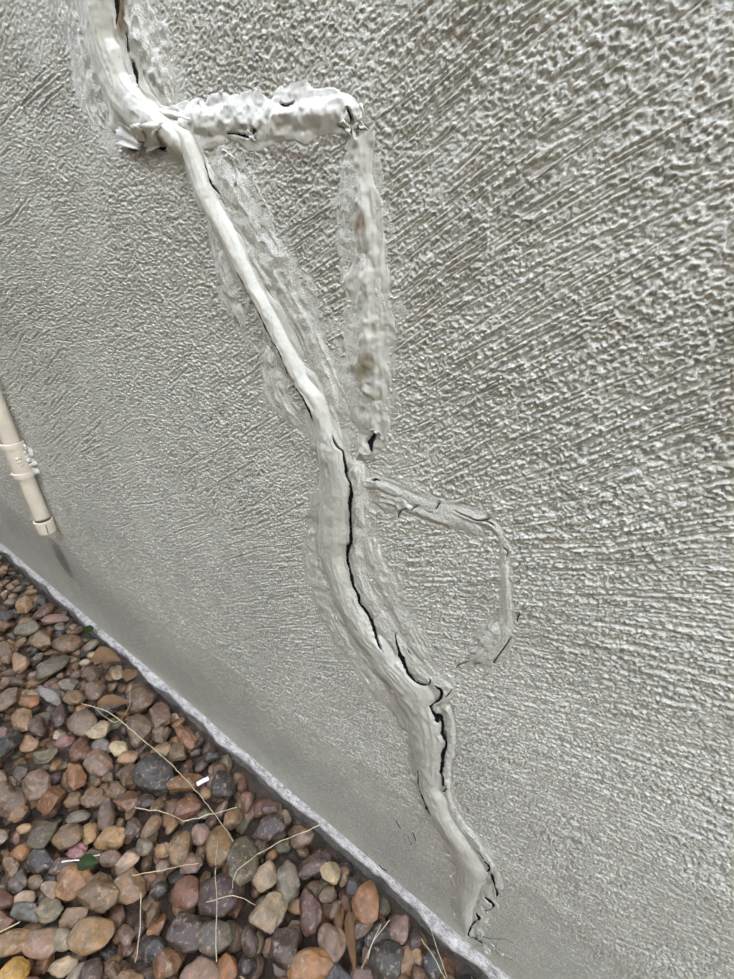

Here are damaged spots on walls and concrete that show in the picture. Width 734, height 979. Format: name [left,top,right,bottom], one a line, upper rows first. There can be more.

crack [114,0,139,84]
crack [236,272,313,421]
crack [398,503,493,525]
crack [333,440,452,816]
crack [468,854,512,960]